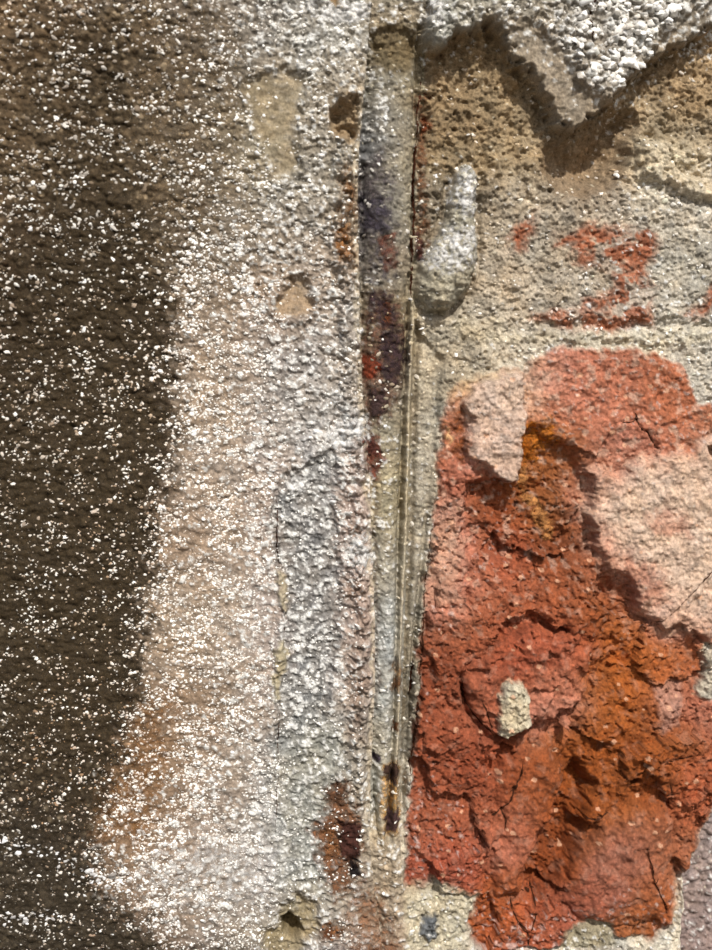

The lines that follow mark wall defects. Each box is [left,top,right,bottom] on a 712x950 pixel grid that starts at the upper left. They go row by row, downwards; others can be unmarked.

spalling [416,1,712,237]
spalling [275,277,314,317]
corrosion [335,151,409,480]
damp [0,0,237,950]
spalling [458,374,596,565]
crack [460,676,493,734]
spalling [262,894,320,950]
corrosion [312,779,394,950]
crack [492,767,523,831]
crack [510,881,537,945]
spalling [521,758,592,895]
crack [648,852,667,922]